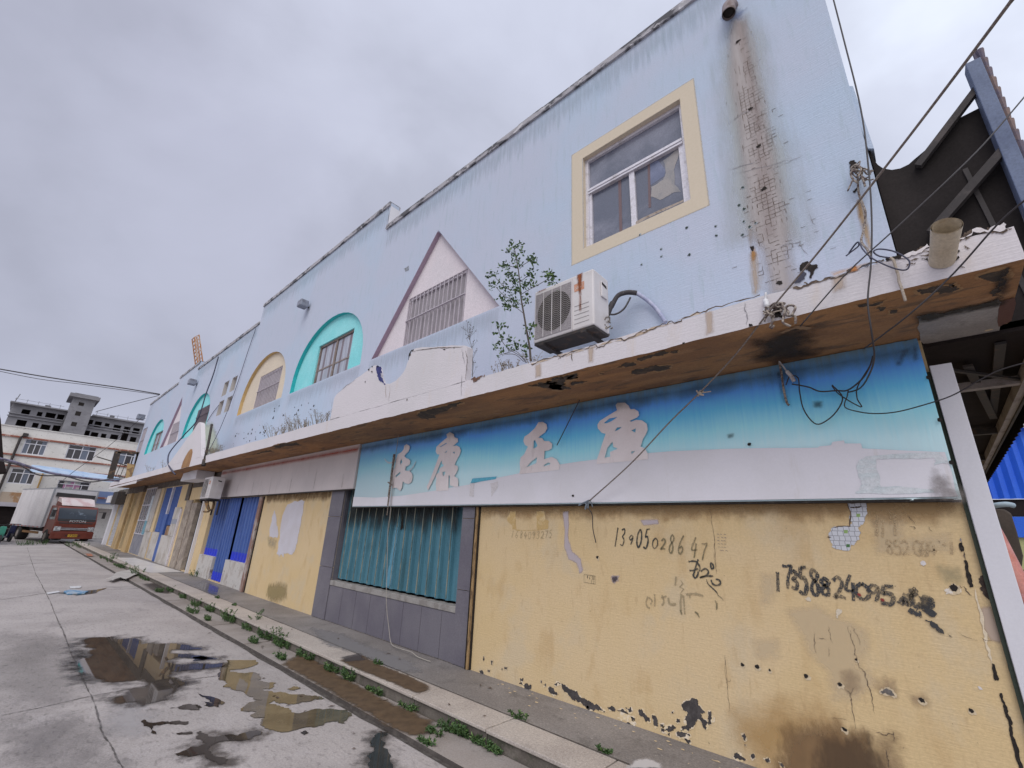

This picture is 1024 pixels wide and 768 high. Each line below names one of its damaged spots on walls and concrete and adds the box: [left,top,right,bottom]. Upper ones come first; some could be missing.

water stain [727,12,795,292]
spalling [794,261,818,283]
peeling [408,347,468,420]
peeling [527,373,587,392]
peeling [519,678,715,745]
crack [814,626,895,766]
water stain [754,724,892,768]